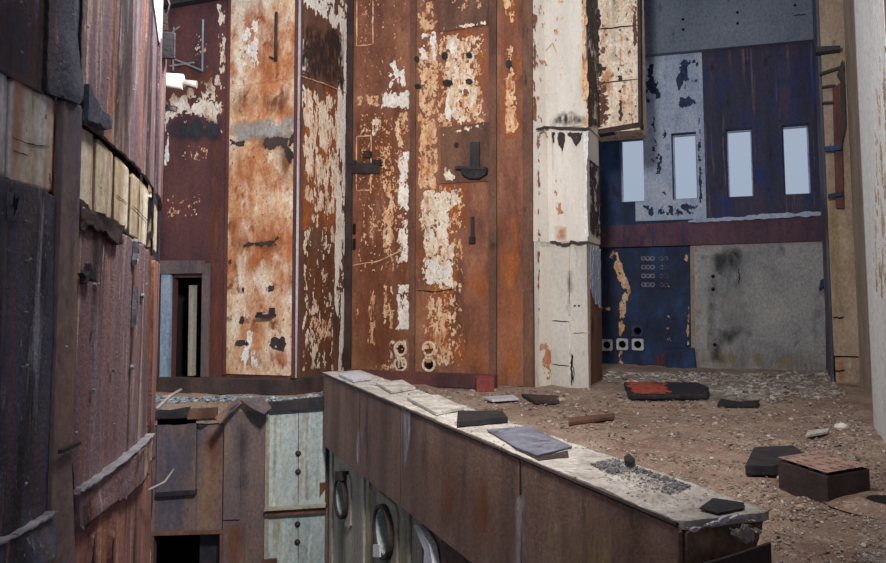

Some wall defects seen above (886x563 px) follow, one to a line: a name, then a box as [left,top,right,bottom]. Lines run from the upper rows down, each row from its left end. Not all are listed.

peeling [164,4,226,166]
peeling [234,0,347,371]
corrosion [361,118,407,363]
peeling [356,0,486,370]
corrosion [445,185,462,230]
peeling [590,246,631,336]
spalling [686,512,762,544]